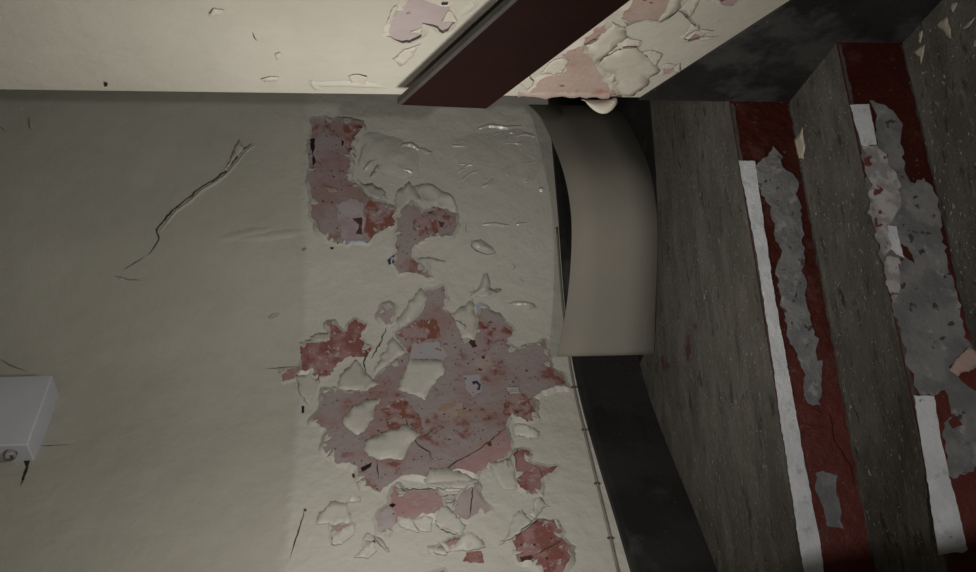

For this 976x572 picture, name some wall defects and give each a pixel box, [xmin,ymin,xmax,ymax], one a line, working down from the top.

peeling [381,0,461,66]
peeling [516,0,682,114]
crack [127,140,255,268]
peeling [266,116,577,572]
peeling [756,147,823,405]
peeling [861,100,976,479]
peeling [815,471,844,529]